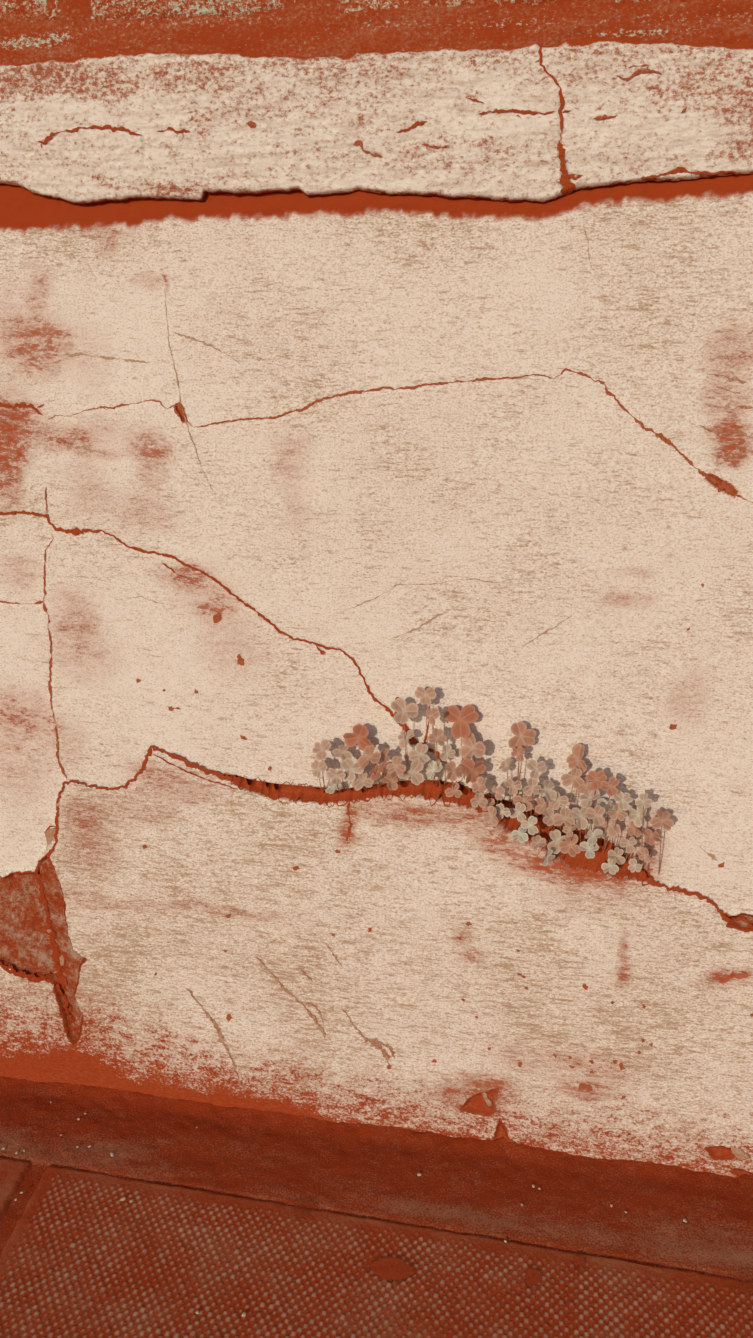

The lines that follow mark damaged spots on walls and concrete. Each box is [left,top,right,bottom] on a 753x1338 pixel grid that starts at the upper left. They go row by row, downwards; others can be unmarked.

crack [467,40,617,196]
crack [616,64,661,81]
crack [0,294,753,503]
crack [0,488,753,931]
spalling [0,828,84,1043]